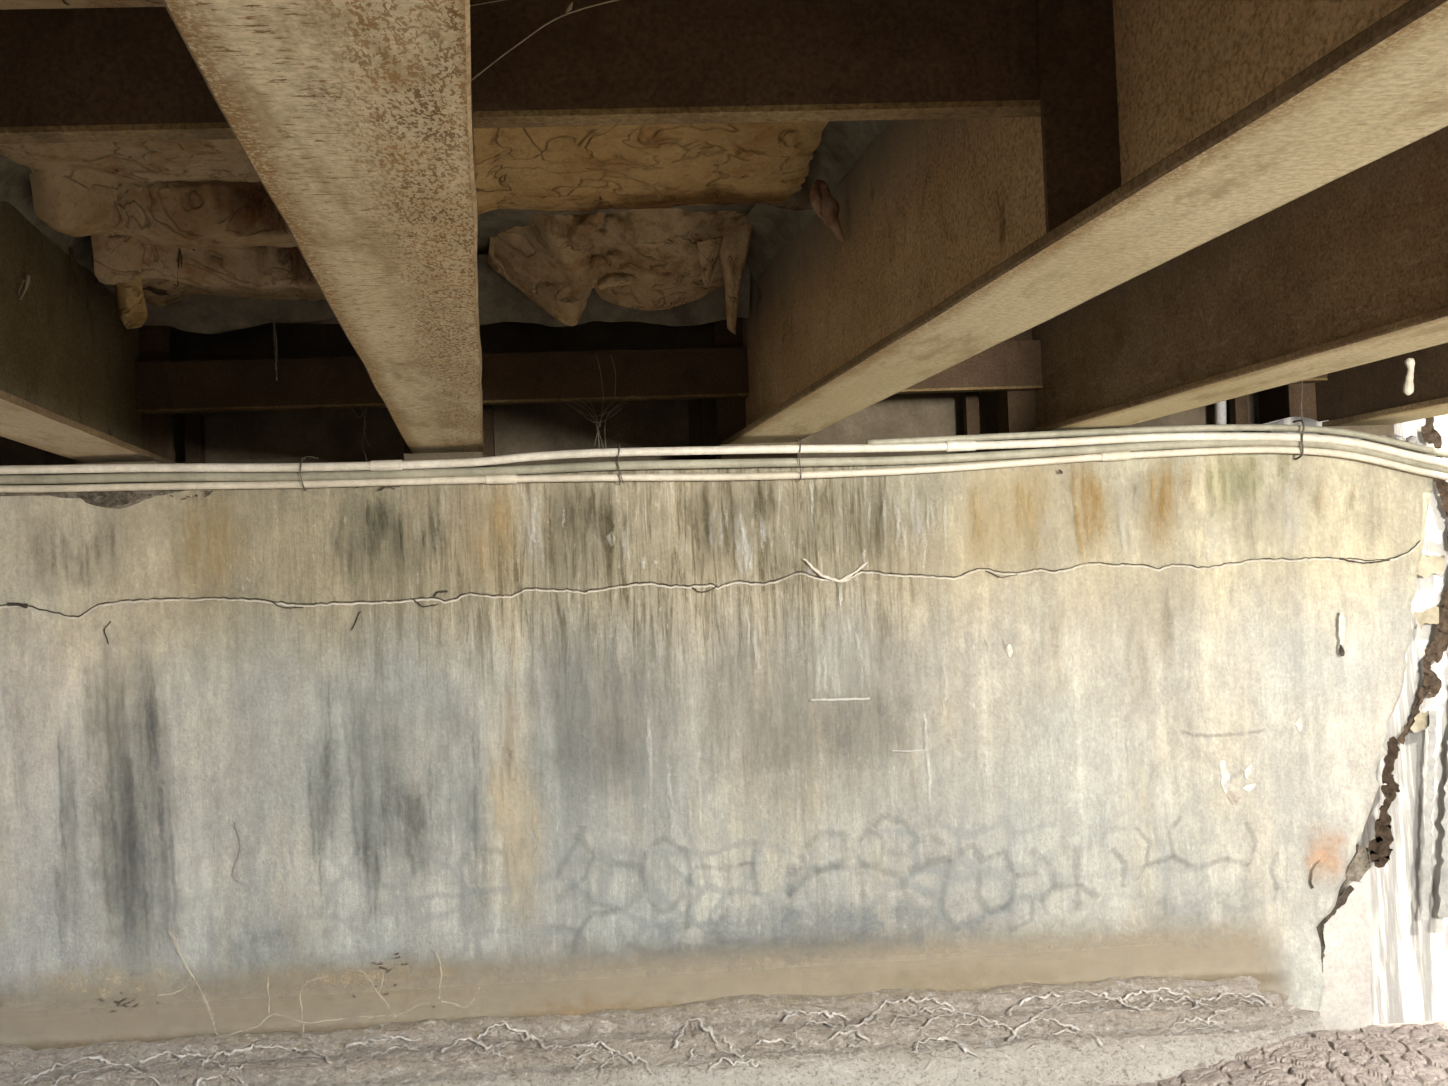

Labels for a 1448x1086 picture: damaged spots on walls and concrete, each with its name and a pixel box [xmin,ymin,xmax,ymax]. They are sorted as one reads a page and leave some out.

crack [0,417,1448,644]
crack [1309,590,1448,968]